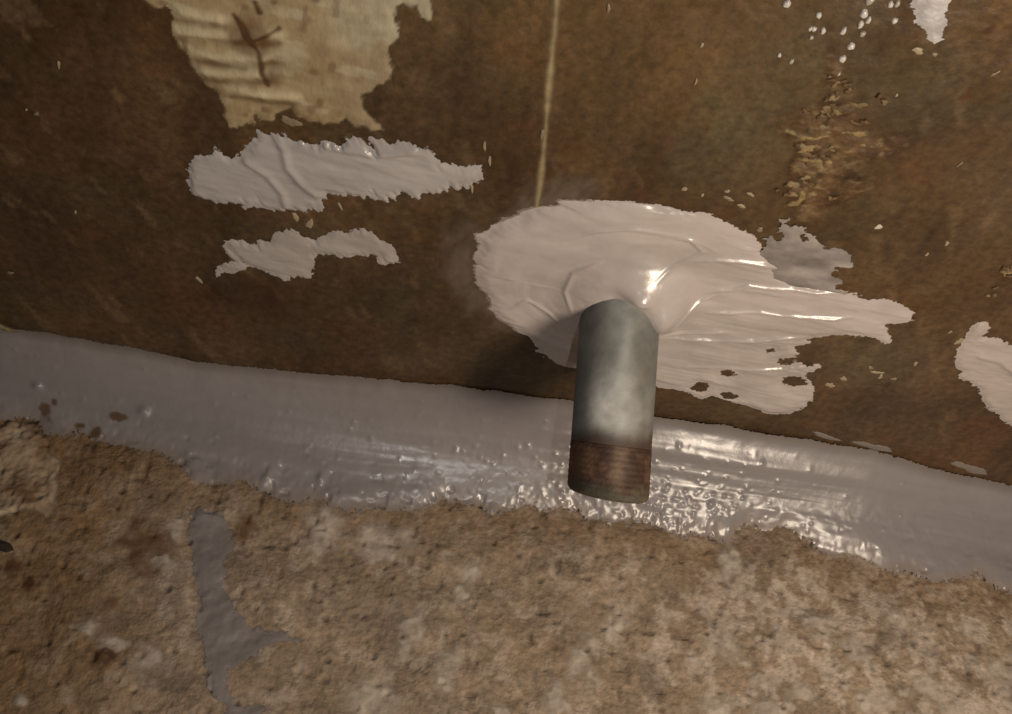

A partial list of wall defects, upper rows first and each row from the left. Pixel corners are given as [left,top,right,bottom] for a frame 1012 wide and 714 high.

peeling [146,0,432,131]